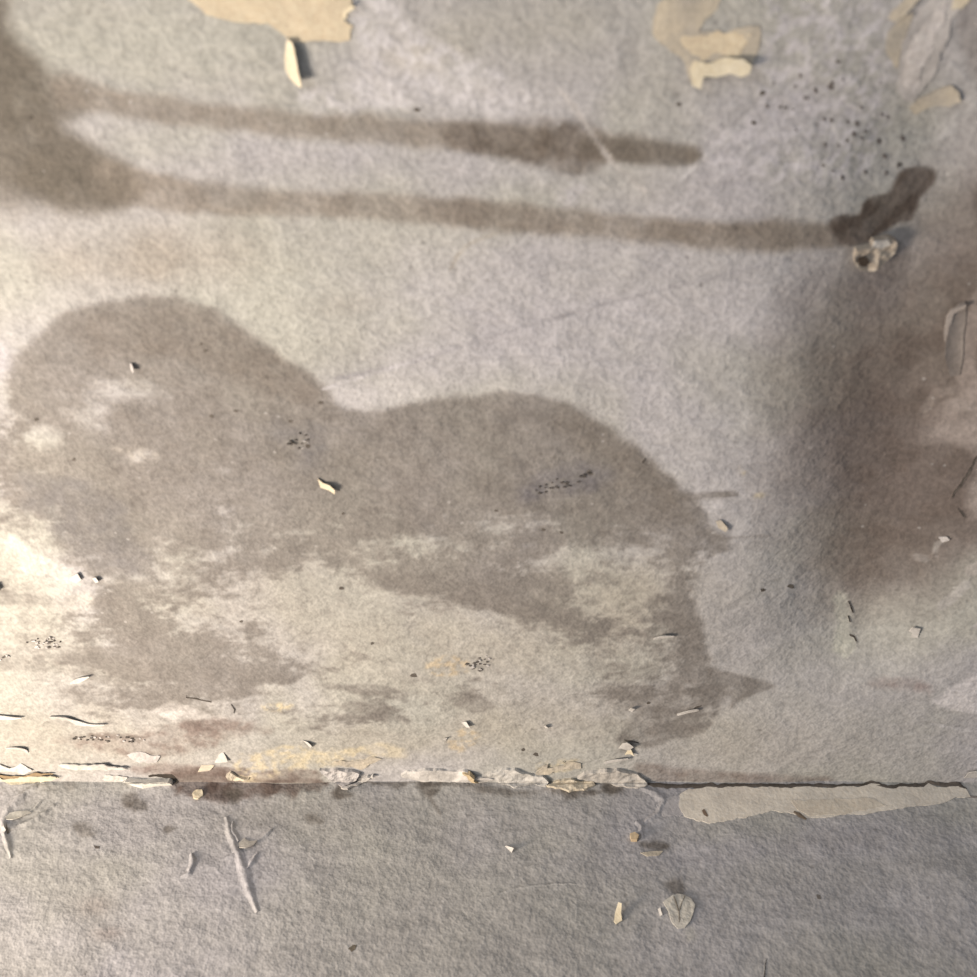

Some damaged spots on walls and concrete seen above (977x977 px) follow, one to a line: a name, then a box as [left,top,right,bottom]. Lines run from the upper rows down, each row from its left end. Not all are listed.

peeling [190,0,355,88]
peeling [653,0,761,89]
peeling [886,0,970,115]
damp [0,0,977,757]
peeling [0,763,59,859]
damp [58,782,81,794]
damp [118,789,152,814]
peeling [198,752,228,772]
damp [219,740,411,807]
peeling [619,742,634,756]
crack [647,780,977,798]
peeling [656,771,977,824]